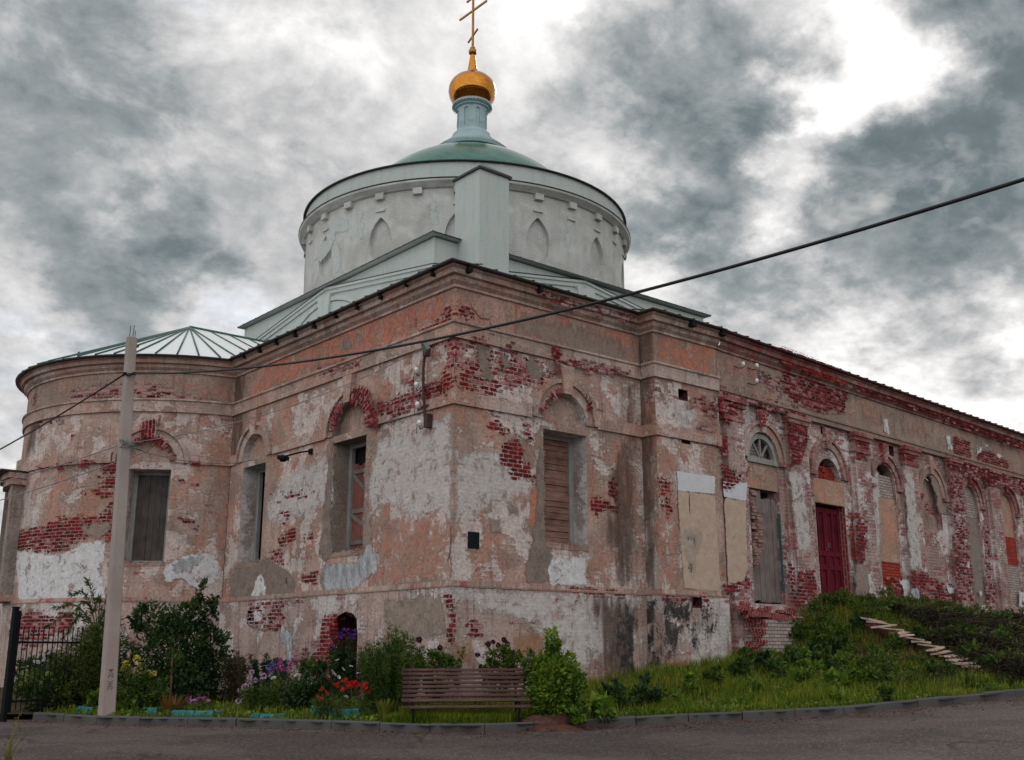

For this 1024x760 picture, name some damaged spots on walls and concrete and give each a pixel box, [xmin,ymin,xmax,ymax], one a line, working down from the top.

flaking render [403,301,475,332]
flaking render [134,419,201,467]
peeling [328,332,631,533]
peeling [8,452,116,650]
peeling [163,553,222,589]
peeling [246,574,339,681]
peeling [444,557,625,668]
damp [594,596,718,676]
peeling [653,346,1024,669]